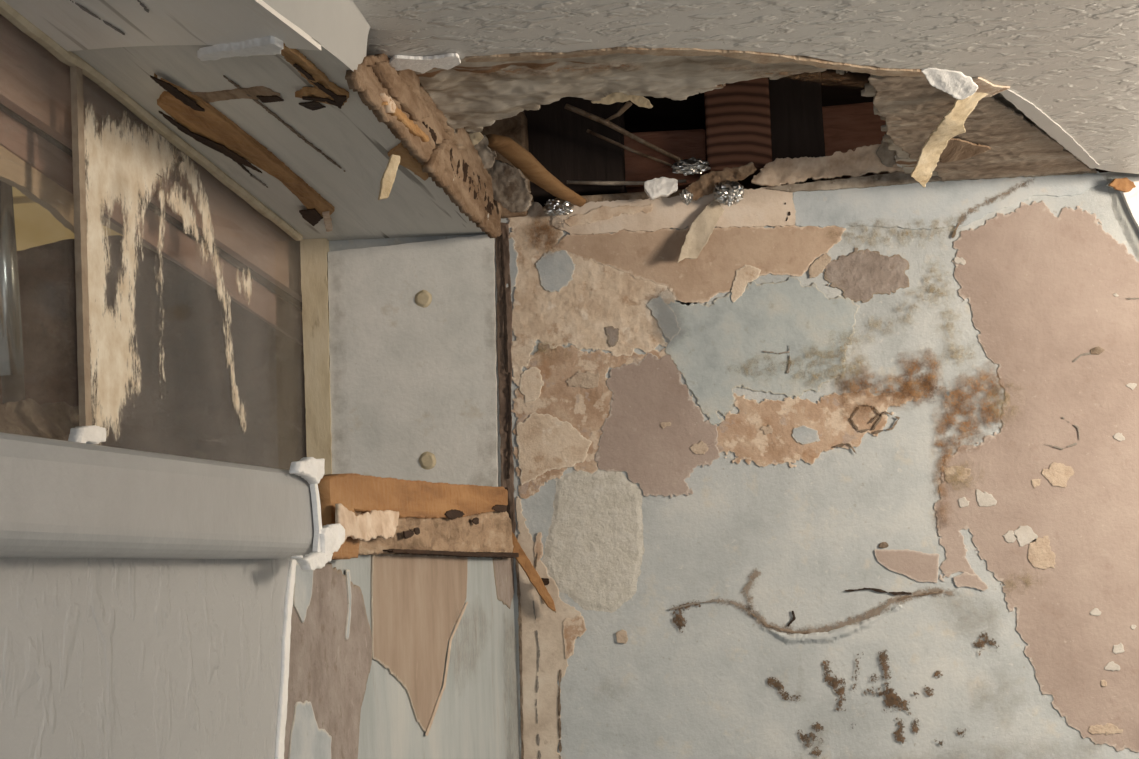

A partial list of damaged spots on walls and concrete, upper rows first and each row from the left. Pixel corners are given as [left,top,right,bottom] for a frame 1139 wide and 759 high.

peeling [197,36,284,61]
spalling [150,73,335,232]
peeling [380,93,396,113]
peeling [911,67,988,188]
leakage [157,144,246,431]
leakage [804,351,939,410]
spalling [1072,346,1104,362]
peeling [493,202,920,759]
peeling [874,542,939,583]
crack [669,570,954,634]
peeling [284,554,468,759]